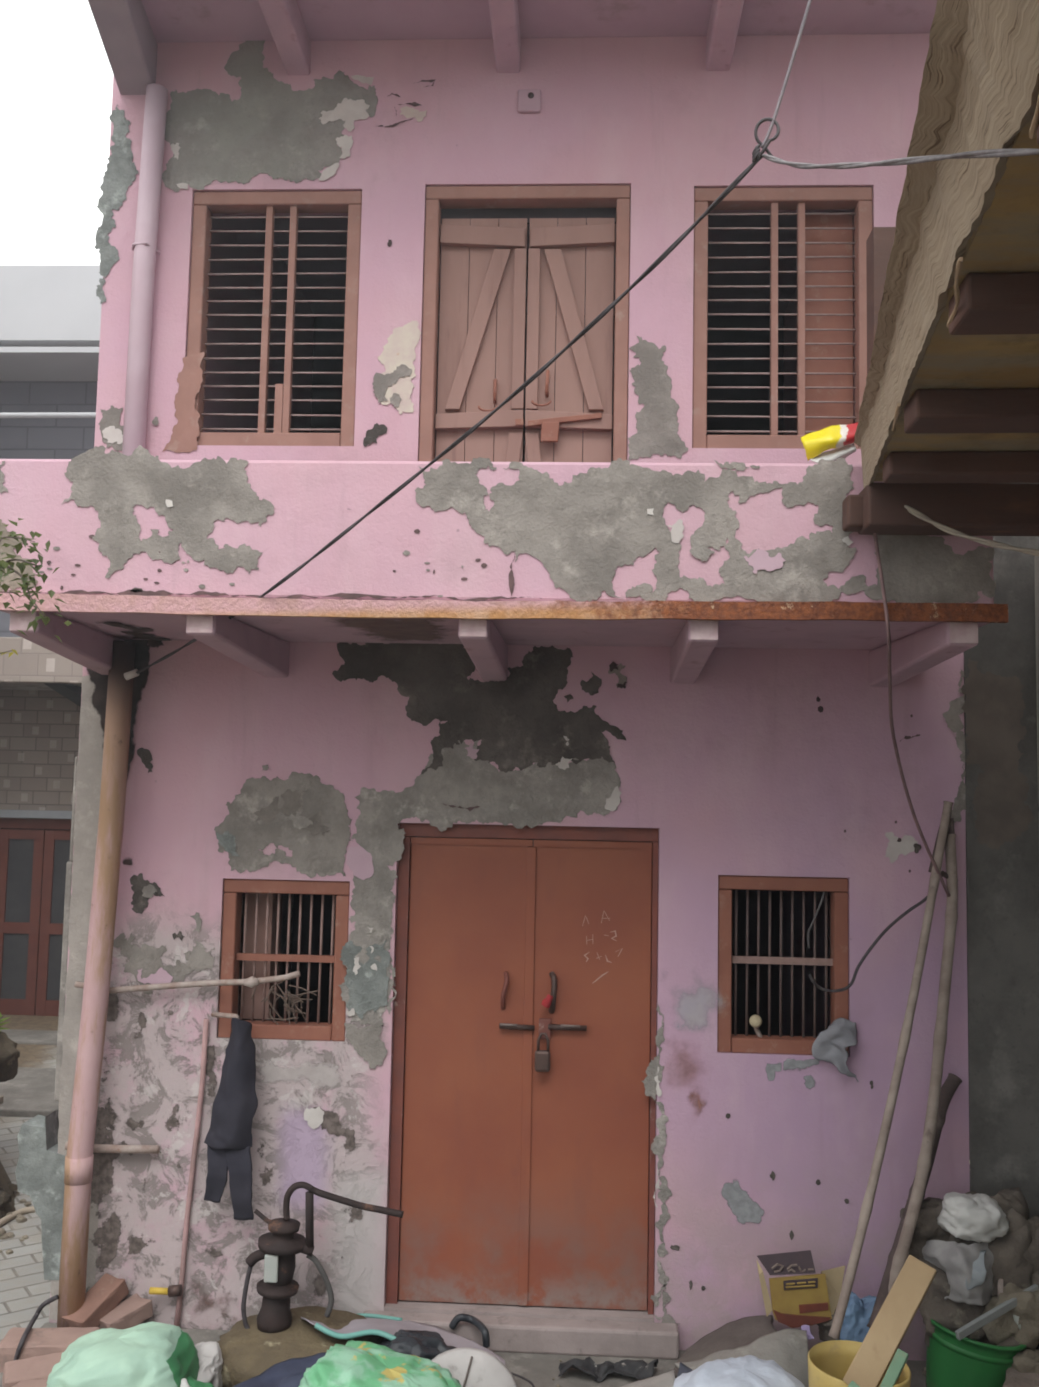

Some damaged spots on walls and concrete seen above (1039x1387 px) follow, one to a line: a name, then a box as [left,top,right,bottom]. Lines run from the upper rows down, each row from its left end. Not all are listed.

flaking render [162,40,378,192]
peeling [94,105,139,304]
peeling [372,320,421,414]
peeling [61,352,274,578]
peeling [415,333,996,603]
flaking render [214,642,627,1069]
peeling [125,1118,144,1130]
peeling [134,1012,147,1038]
peeling [113,912,215,995]
peeling [206,1045,217,1097]
peeling [642,1005,680,1324]